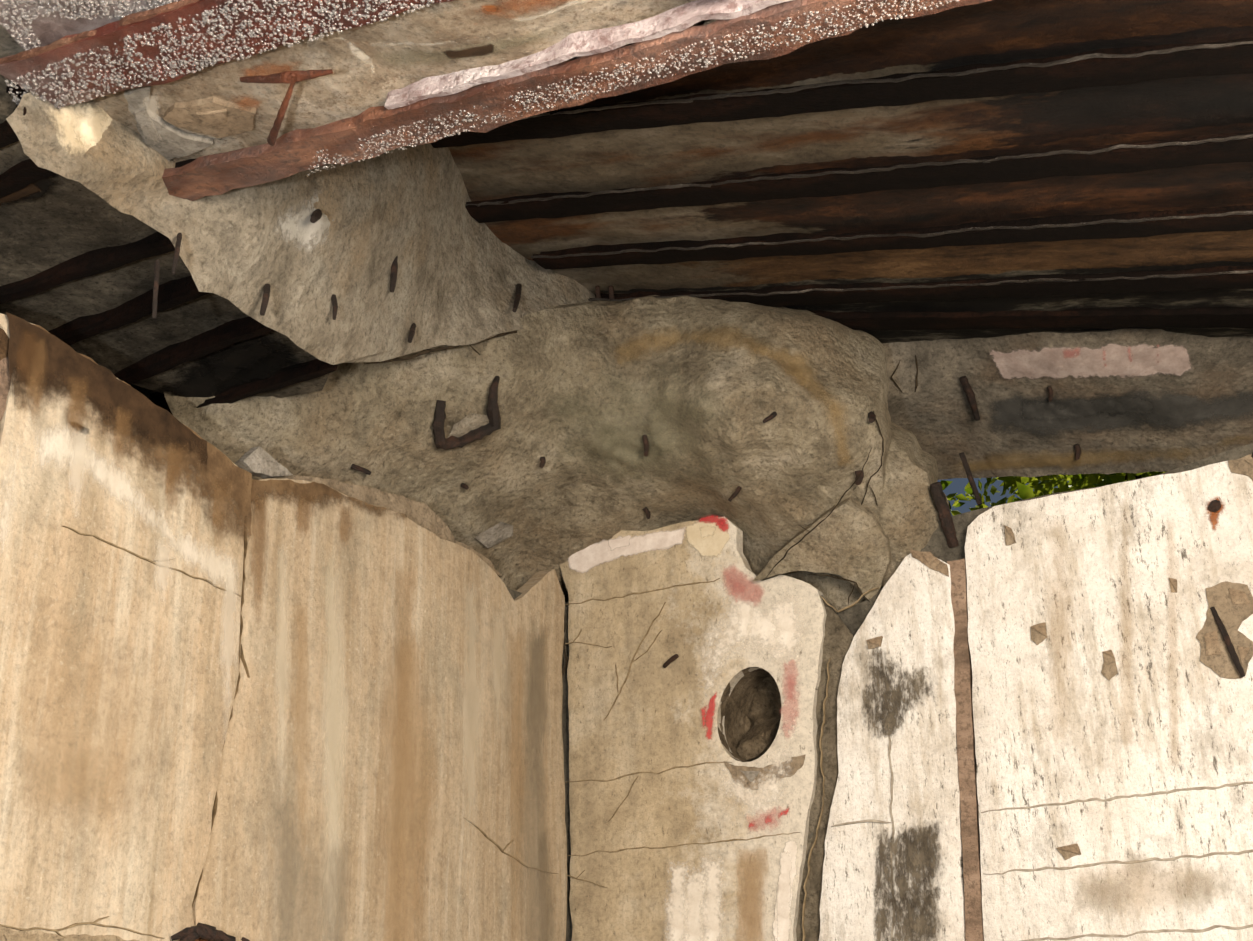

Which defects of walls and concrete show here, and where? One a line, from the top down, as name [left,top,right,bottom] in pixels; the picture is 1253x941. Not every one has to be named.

spalling [240,69,333,146]
spalling [0,328,9,360]
spalling [6,86,959,613]
water stain [6,312,407,590]
corrosion [1207,498,1224,530]
crack [62,526,250,751]
spalling [1196,581,1253,679]
water stain [862,647,933,737]
crack [210,791,218,831]
crack [0,916,163,938]
crack [192,869,203,908]
water stain [875,826,940,941]